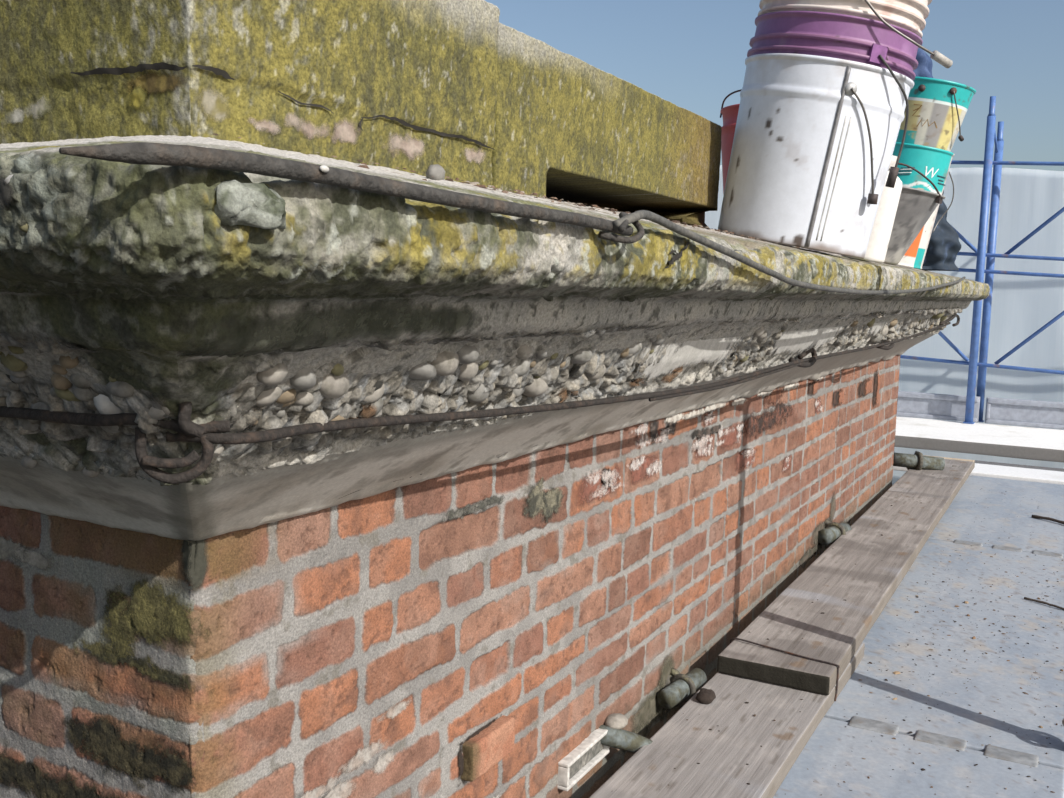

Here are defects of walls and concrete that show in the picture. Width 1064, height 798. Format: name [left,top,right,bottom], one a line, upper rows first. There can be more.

crack [71,62,234,80]
crack [278,91,333,113]
crack [359,115,495,150]
spalling [718,319,800,374]
spalling [0,332,170,452]
spalling [213,326,670,457]
peeling [666,398,746,423]
spalling [758,376,824,407]
spalling [833,390,845,406]
spalling [858,373,881,407]
water stain [694,410,755,469]